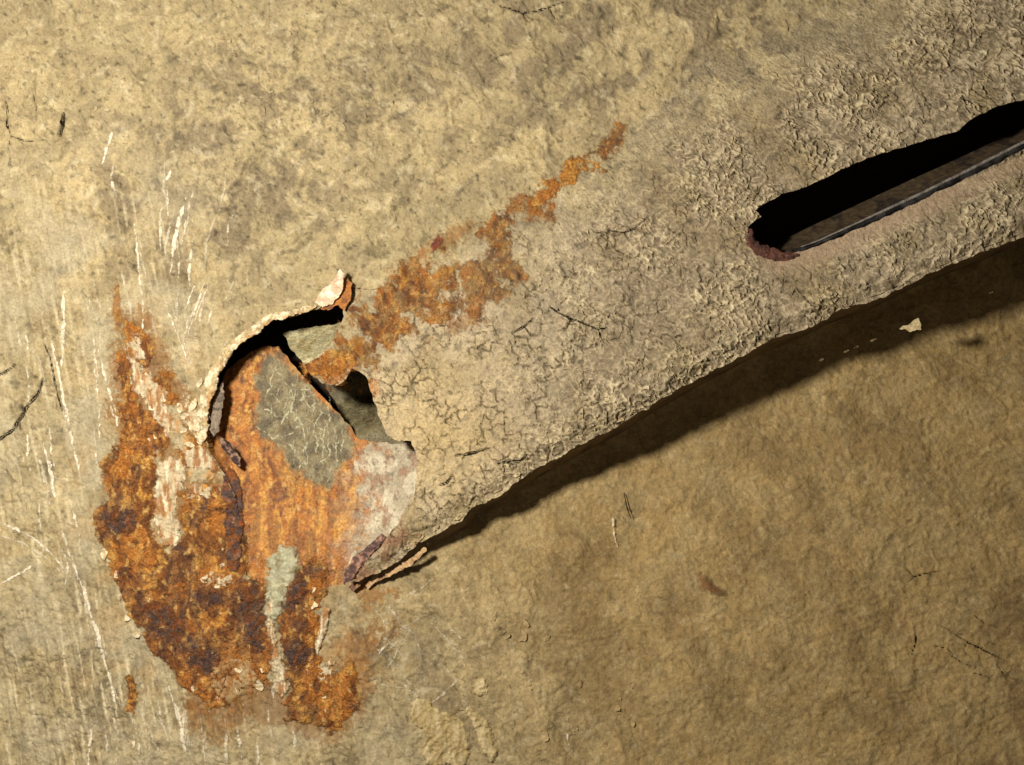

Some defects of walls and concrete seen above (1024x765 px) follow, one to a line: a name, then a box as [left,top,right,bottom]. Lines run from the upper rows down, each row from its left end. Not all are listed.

rust [301,121,627,394]
crack [513,302,605,337]
peeling [127,333,223,548]
peeling [200,563,232,588]
rust [93,320,360,736]
peeling [210,545,302,703]
peeling [311,587,336,681]
crack [440,448,526,486]